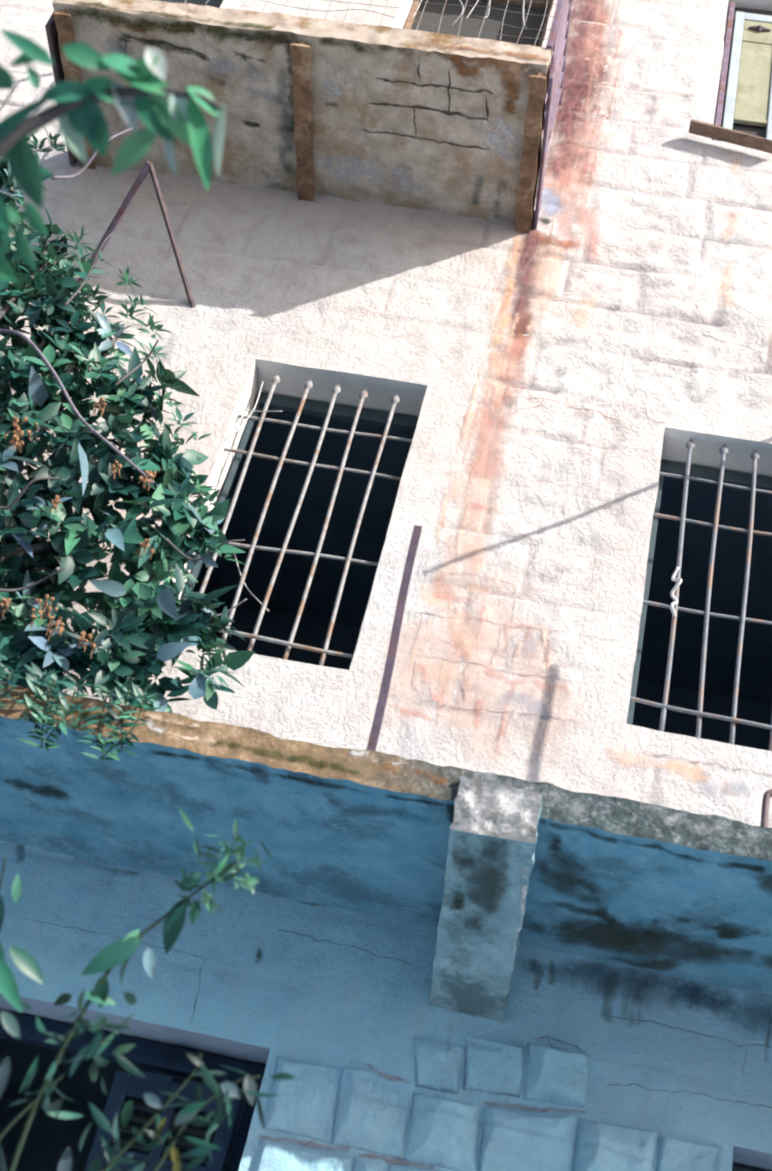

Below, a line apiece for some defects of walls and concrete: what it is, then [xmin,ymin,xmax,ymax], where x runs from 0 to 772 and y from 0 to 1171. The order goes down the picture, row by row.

crack [362,60,496,150]
rust [439,52,531,113]
rust [548,0,606,177]
rust [492,228,574,404]
leakage [451,846,504,925]
leakage [541,825,772,1025]
crack [602,1016,772,1108]